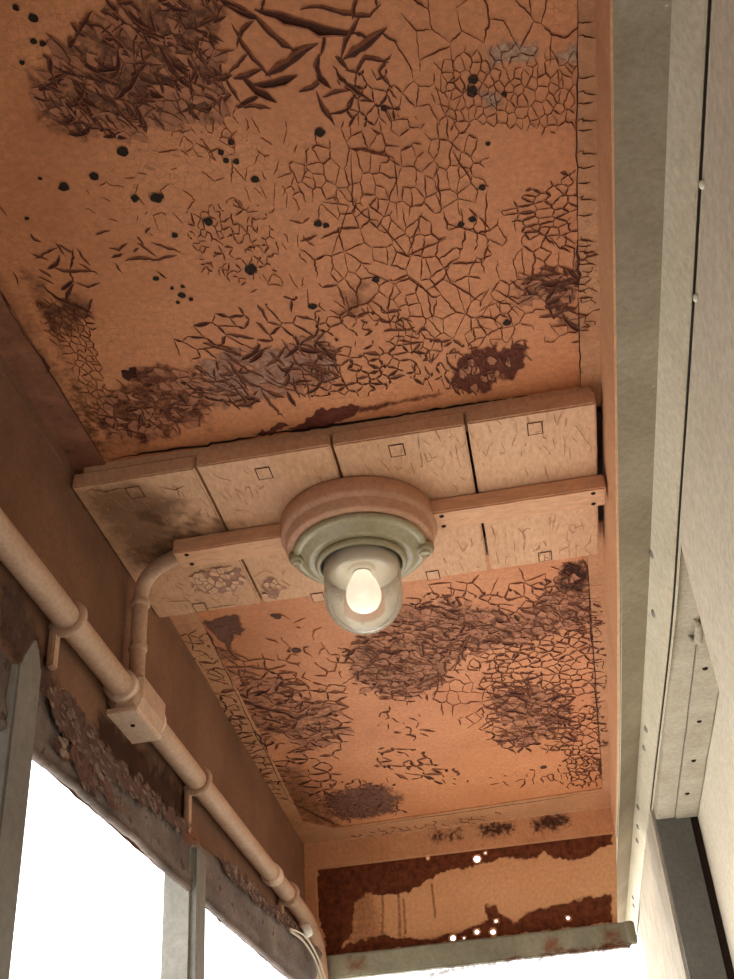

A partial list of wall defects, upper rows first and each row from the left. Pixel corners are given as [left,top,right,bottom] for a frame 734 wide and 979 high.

peeling [29,0,255,157]
crack [0,0,600,493]
peeling [510,266,578,332]
peeling [98,335,342,443]
peeling [449,338,532,396]
crack [85,472,263,557]
peeling [48,687,192,835]
peeling [216,646,354,755]
crack [161,517,608,838]
peeling [342,560,593,700]
peeling [484,678,575,748]
peeling [219,853,301,939]